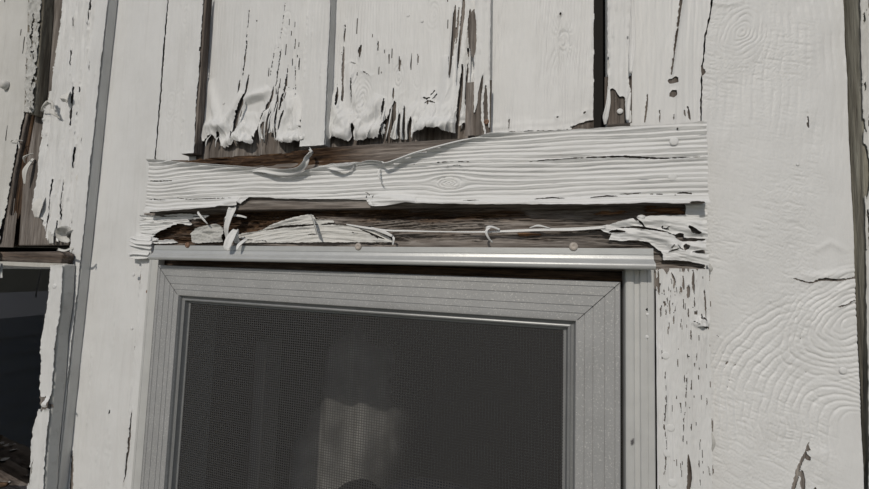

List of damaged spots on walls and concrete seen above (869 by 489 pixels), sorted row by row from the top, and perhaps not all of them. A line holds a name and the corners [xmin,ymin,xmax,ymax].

peeling [23,0,96,243]
peeling [146,0,636,187]
spalling [664,72,682,100]
peeling [861,0,869,158]
peeling [0,198,17,247]
peeling [128,191,713,273]
crack [787,273,856,310]
spalling [37,387,54,417]
spalling [27,450,38,489]
peeling [786,433,830,489]